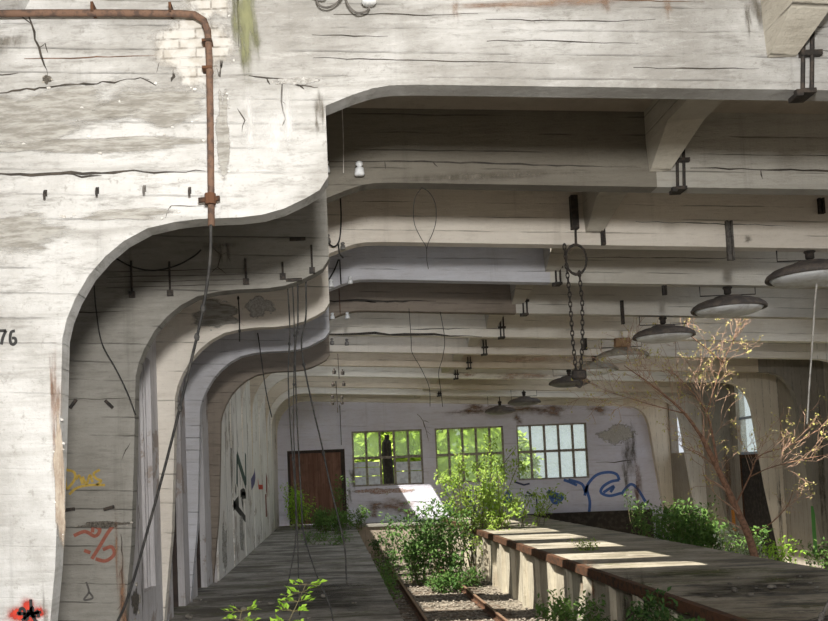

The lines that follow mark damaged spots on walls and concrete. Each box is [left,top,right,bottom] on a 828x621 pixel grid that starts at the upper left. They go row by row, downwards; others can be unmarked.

crack [0,17,175,94]
water stain [232,4,246,65]
flaking render [216,91,230,179]
crack [0,170,202,178]
crack [706,167,828,179]